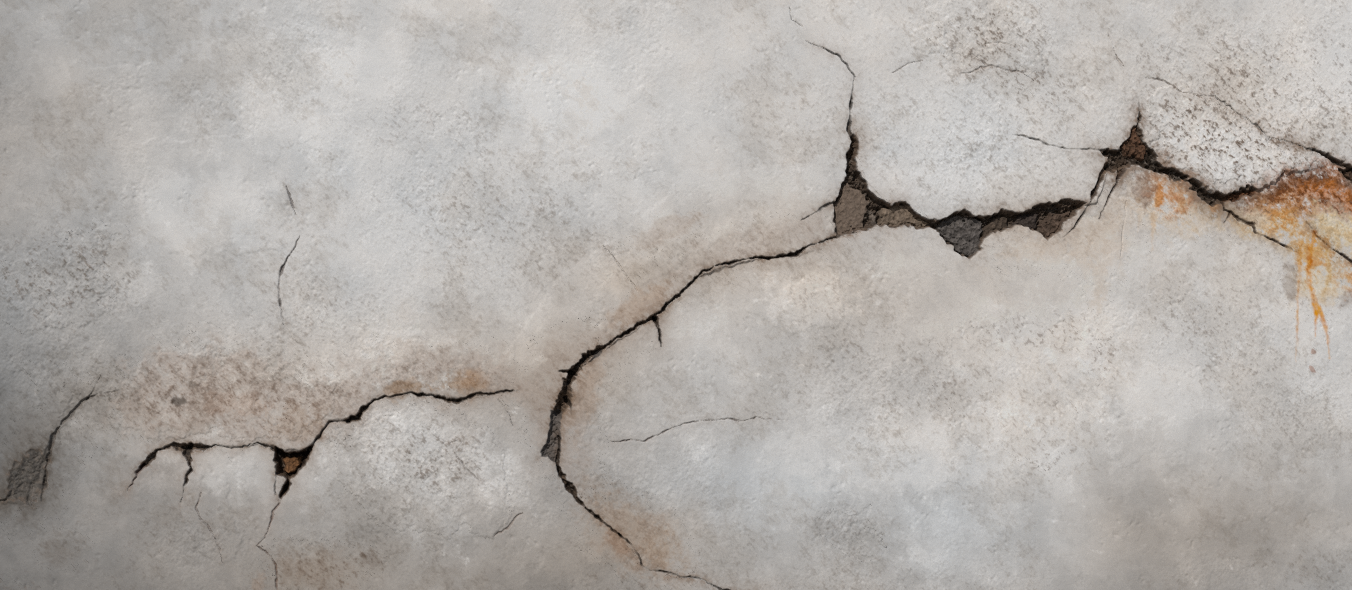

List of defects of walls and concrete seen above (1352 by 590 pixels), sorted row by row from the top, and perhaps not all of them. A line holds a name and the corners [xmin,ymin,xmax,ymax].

crack [541,11,1352,590]
corrosion [1130,151,1352,374]
crack [0,380,120,508]
crack [128,442,275,557]
crack [259,502,281,590]
crack [310,389,519,451]
crack [450,441,479,481]
crack [493,513,523,537]